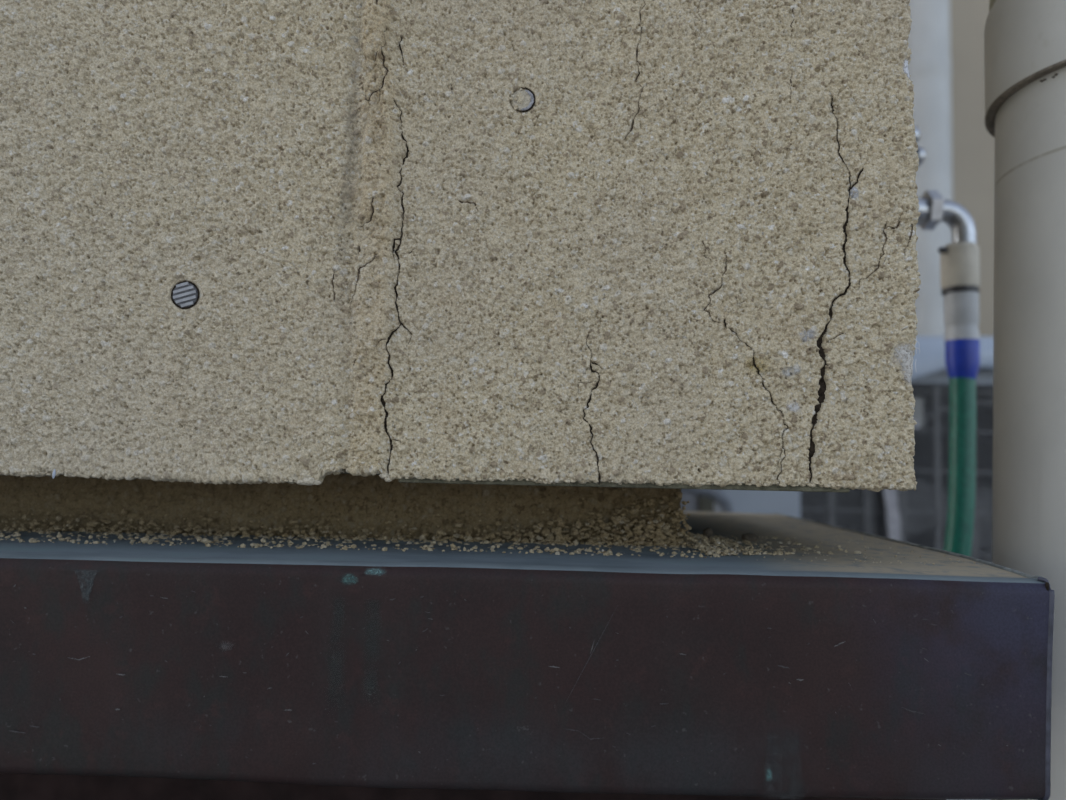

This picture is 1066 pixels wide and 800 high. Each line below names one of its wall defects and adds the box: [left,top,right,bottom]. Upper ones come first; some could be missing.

crack [332,29,412,478]
crack [578,335,601,485]
crack [703,92,913,484]